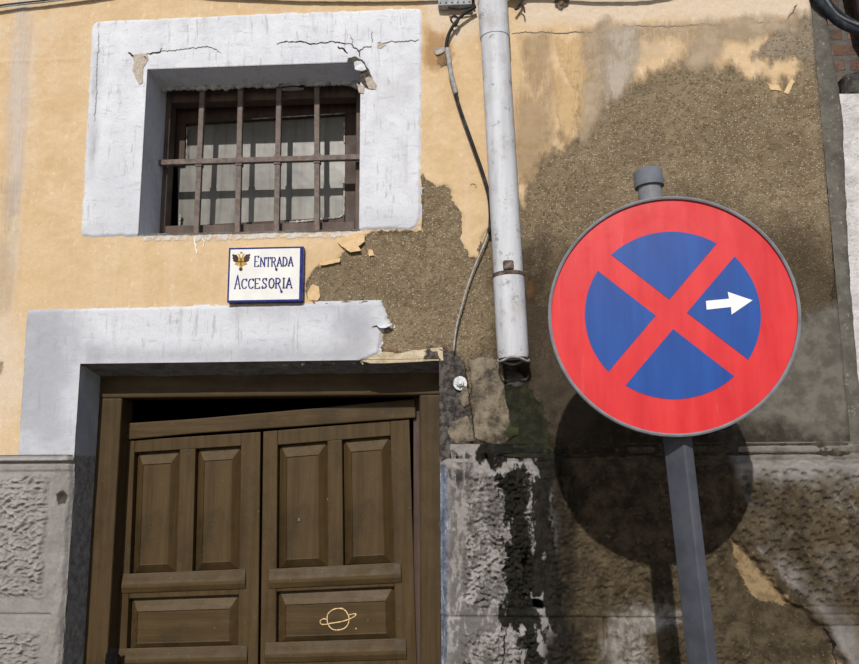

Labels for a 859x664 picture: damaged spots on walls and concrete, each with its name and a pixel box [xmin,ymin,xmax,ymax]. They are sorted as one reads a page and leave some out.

crack [276,31,419,56]
spalling [128,48,162,84]
spalling [305,14,838,457]
damp [692,423,850,456]
spalling [56,490,68,505]
damp [475,362,664,664]